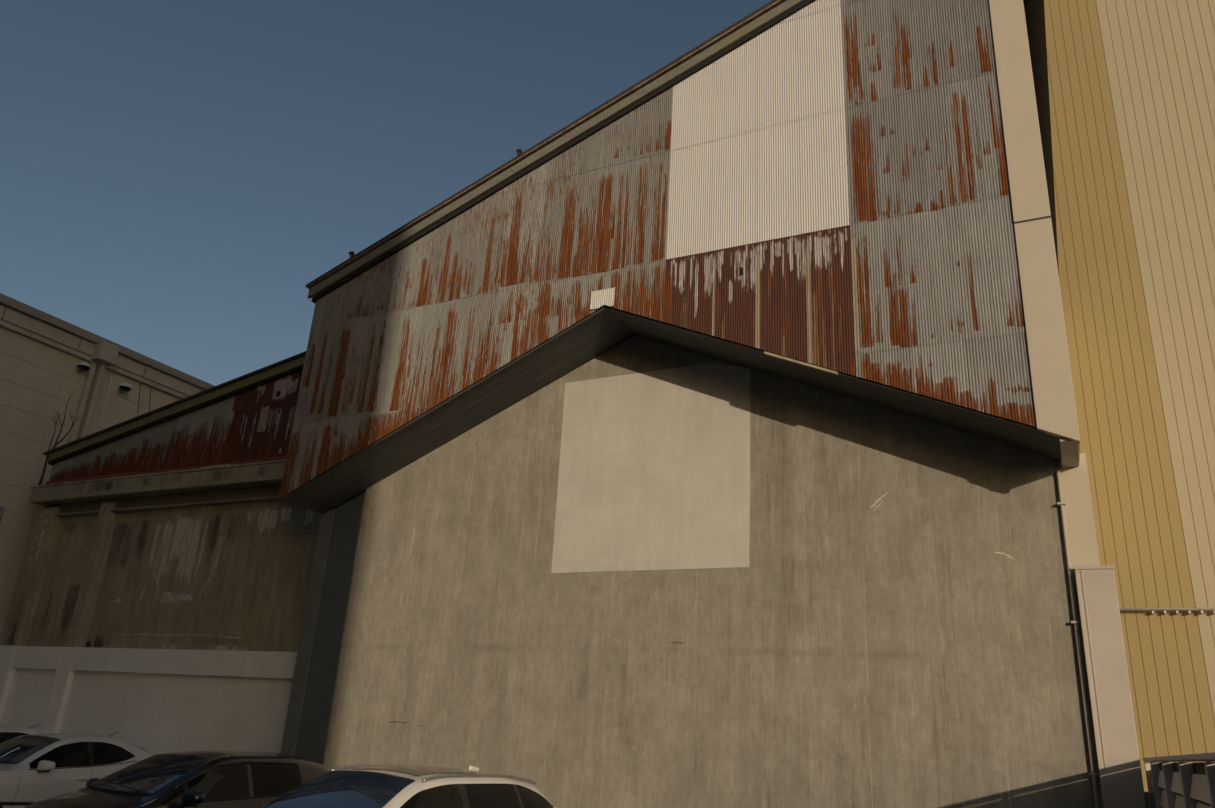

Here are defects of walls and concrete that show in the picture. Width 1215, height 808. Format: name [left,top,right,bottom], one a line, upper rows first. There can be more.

corrosion [48,120,687,499]
corrosion [812,12,1035,426]
leakage [108,507,314,602]